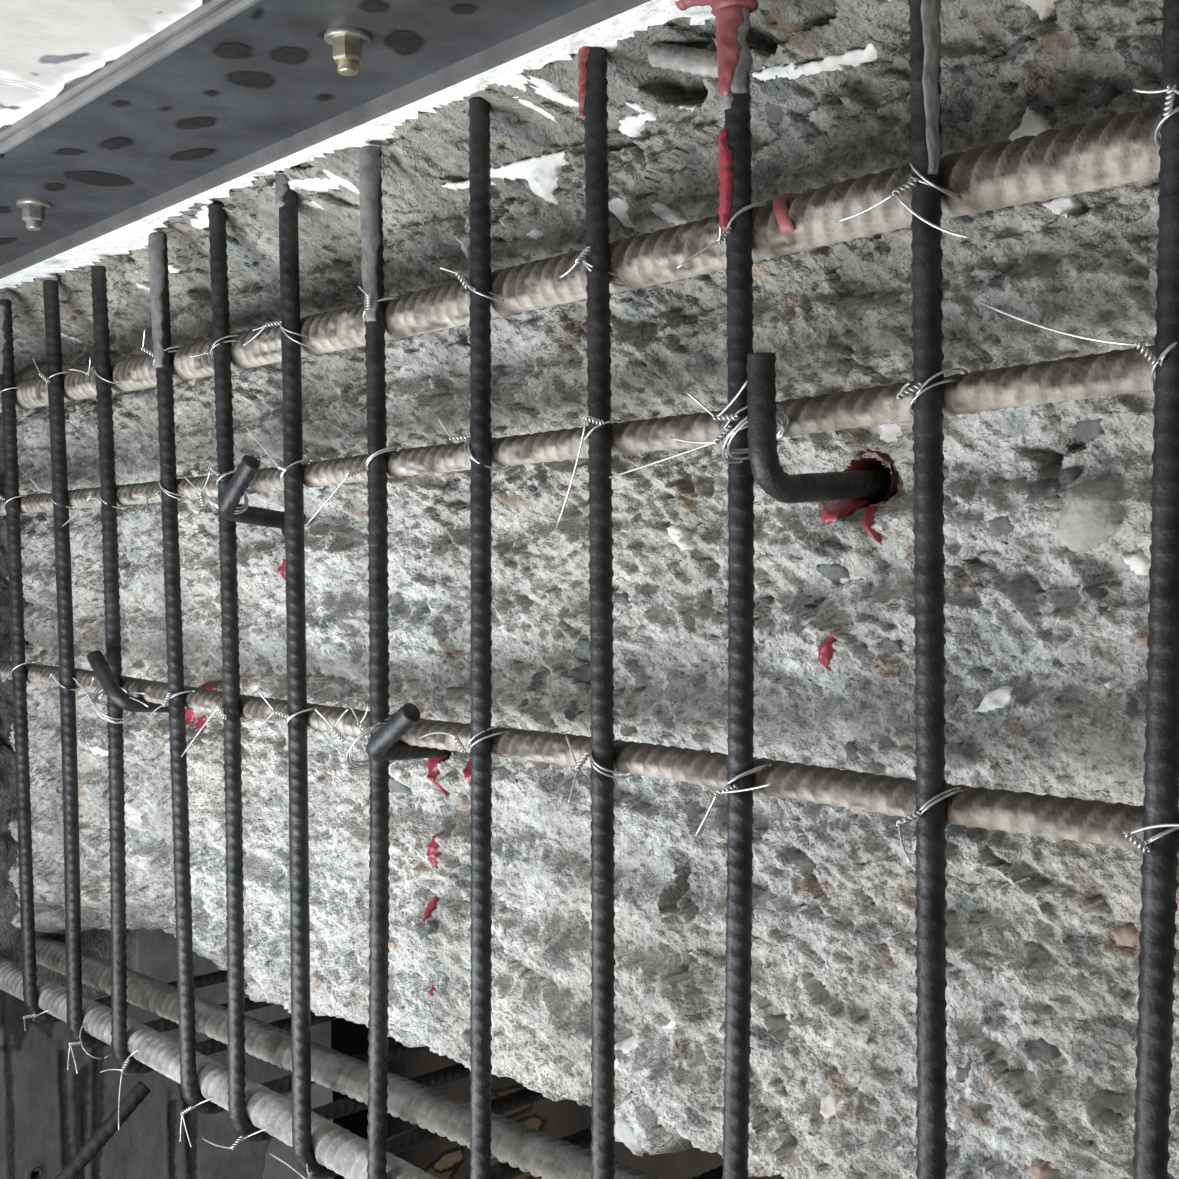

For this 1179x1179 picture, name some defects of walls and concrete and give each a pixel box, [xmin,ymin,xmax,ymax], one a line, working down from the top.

spalling [609,17,718,138]
peeling [490,149,570,205]
spalling [940,76,1162,221]
spalling [0,375,67,1023]
spalling [945,783,1145,850]
water stain [0,989,52,1179]
water stain [58,1047,104,1167]
water stain [77,1150,102,1179]
water stain [167,1084,197,1179]
spalling [311,1111,368,1179]
spalling [387,1071,471,1149]
spalling [491,1112,592,1179]